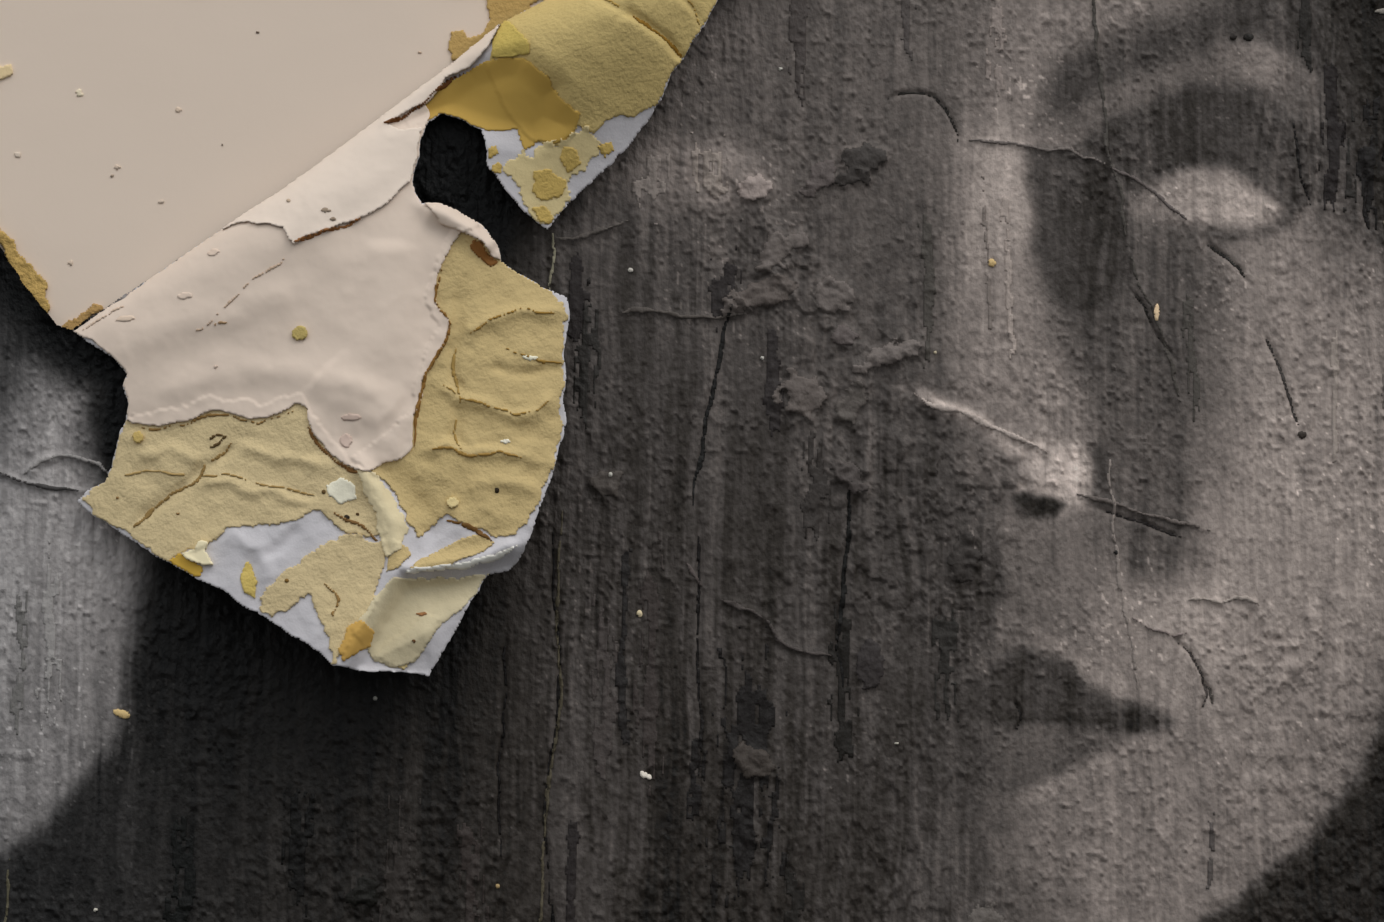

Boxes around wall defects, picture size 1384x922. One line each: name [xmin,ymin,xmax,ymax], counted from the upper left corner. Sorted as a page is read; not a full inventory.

peeling [0,0,544,330]